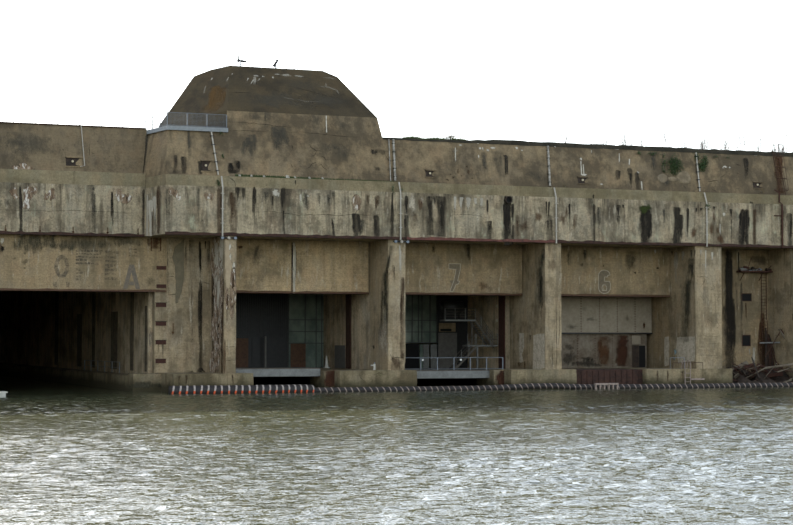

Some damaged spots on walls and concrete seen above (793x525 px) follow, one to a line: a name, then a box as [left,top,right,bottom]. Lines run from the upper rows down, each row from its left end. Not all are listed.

spalling [9,186,55,210]
leakage [14,186,106,253]
leakage [352,213,362,236]
leakage [426,196,463,237]
leakage [503,196,526,245]
leakage [639,206,656,253]
leakage [671,207,702,254]
leakage [191,187,256,373]
leakage [713,201,756,368]
corrosion [601,336,627,366]